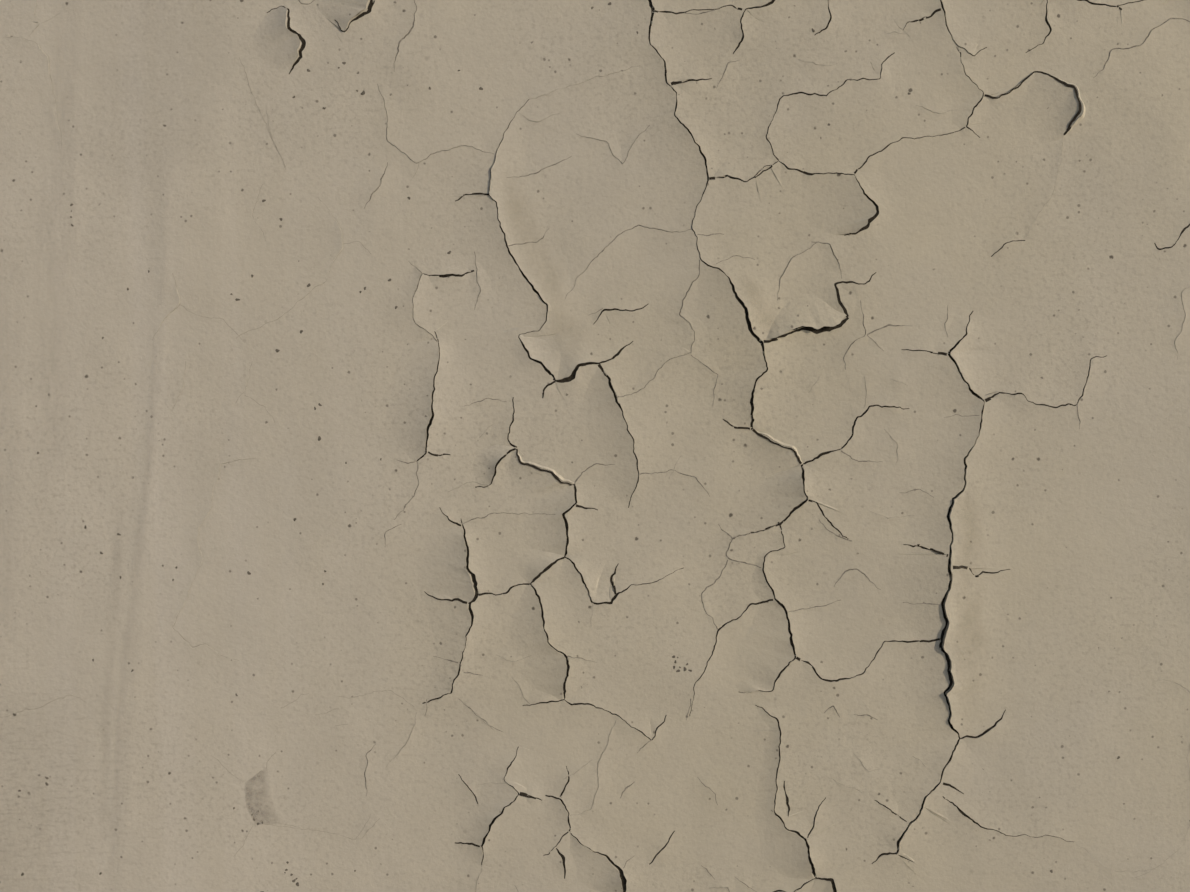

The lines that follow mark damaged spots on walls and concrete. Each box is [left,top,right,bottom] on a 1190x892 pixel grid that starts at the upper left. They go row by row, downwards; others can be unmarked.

peeling [253,0,449,82]
crack [1017,0,1167,66]
peeling [1083,8,1190,89]
crack [350,80,493,217]
crack [565,115,692,333]
crack [796,299,912,407]
peeling [381,0,1119,892]
crack [809,520,891,601]
crack [235,690,414,855]
crack [432,642,532,745]
crack [555,681,678,824]
crack [817,699,885,786]